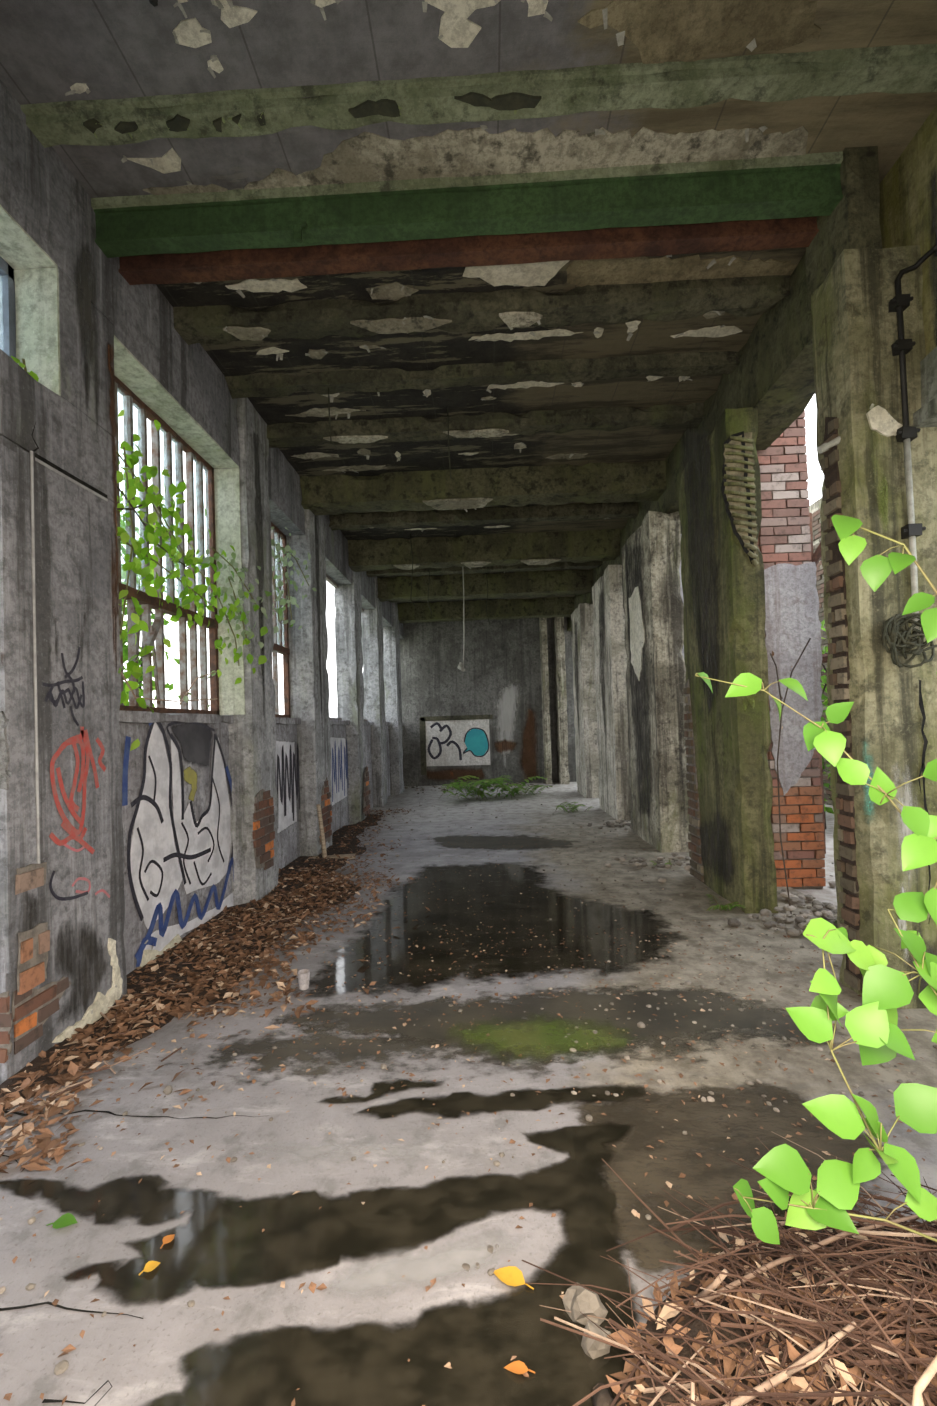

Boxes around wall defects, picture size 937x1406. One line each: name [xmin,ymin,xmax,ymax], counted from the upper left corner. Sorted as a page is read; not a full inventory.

peeling [172,0,257,78]
peeling [422,0,501,48]
peeling [225,278,307,298]
peeling [463,254,797,287]
peeling [223,326,328,361]
peeling [350,316,452,353]
peeling [469,312,604,342]
peeling [670,311,742,338]
peeling [291,435,401,473]
leakage [683,425,719,713]
leakage [908,947,937,990]
flaking render [0,922,123,1063]